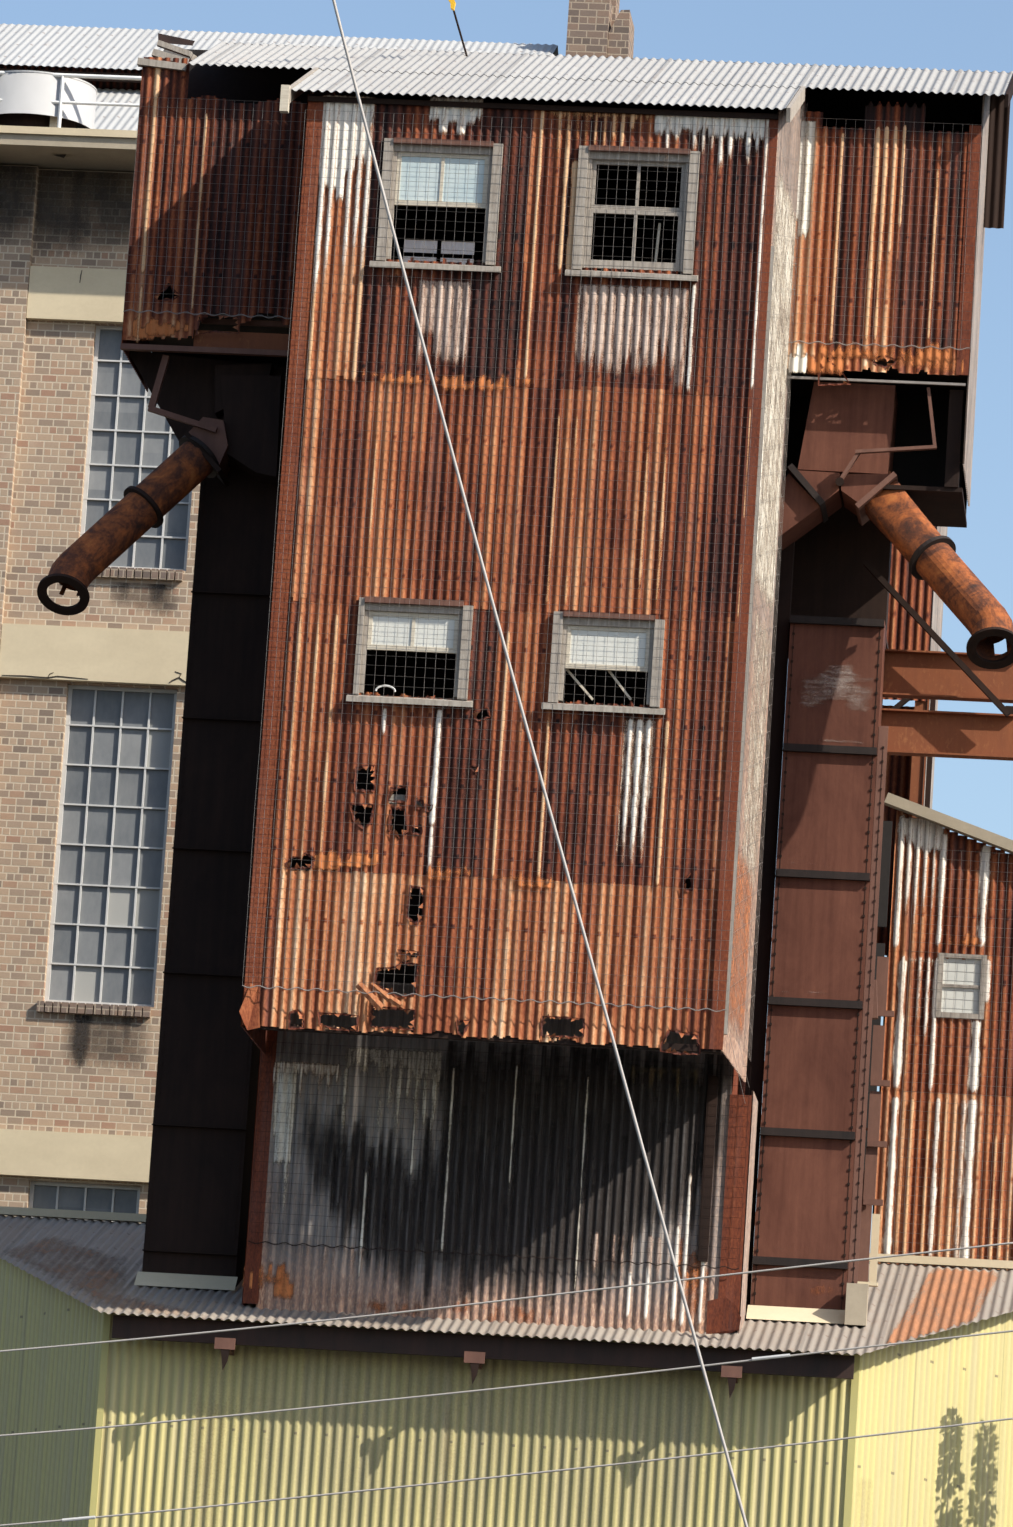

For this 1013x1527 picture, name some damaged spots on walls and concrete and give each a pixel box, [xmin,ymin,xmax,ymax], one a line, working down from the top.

corrosion [351,111,545,391]
leakage [686,284,696,390]
corrosion [807,125,964,373]
corrosion [281,615,379,873]
corrosion [491,631,554,889]
leakage [73,1015,128,1062]
peeling [273,1014,442,1203]
leakage [333,1128,392,1277]
peeling [369,951,416,1009]
leakage [410,1066,699,1321]
leakage [697,1262,706,1324]
corrosion [886,1098,1006,1344]